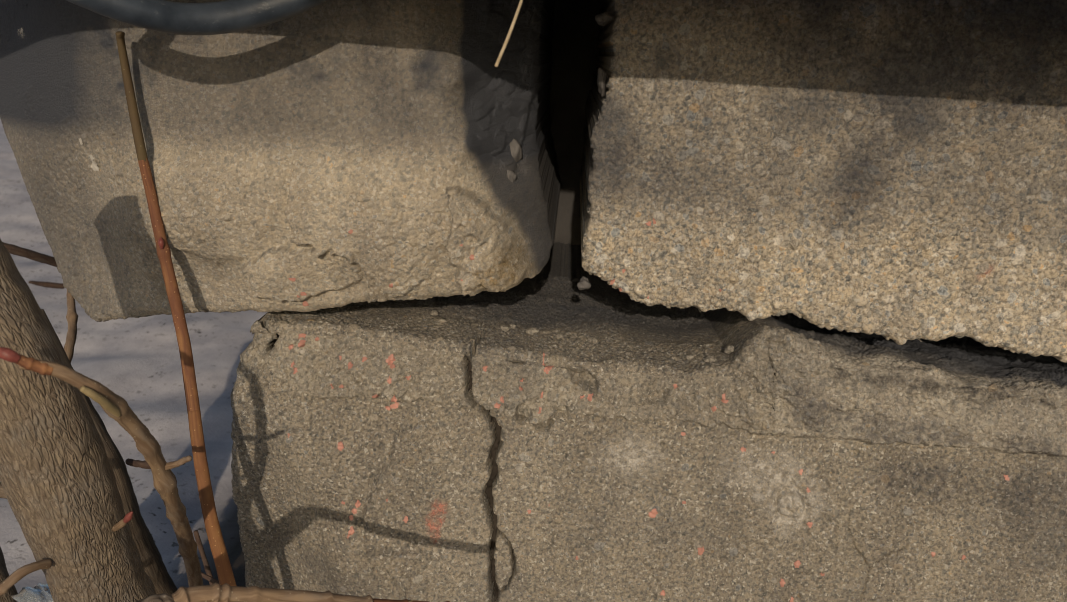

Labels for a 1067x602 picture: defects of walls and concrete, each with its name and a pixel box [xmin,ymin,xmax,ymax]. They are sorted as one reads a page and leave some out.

crack [467,358,515,602]
spalling [240,333,792,437]